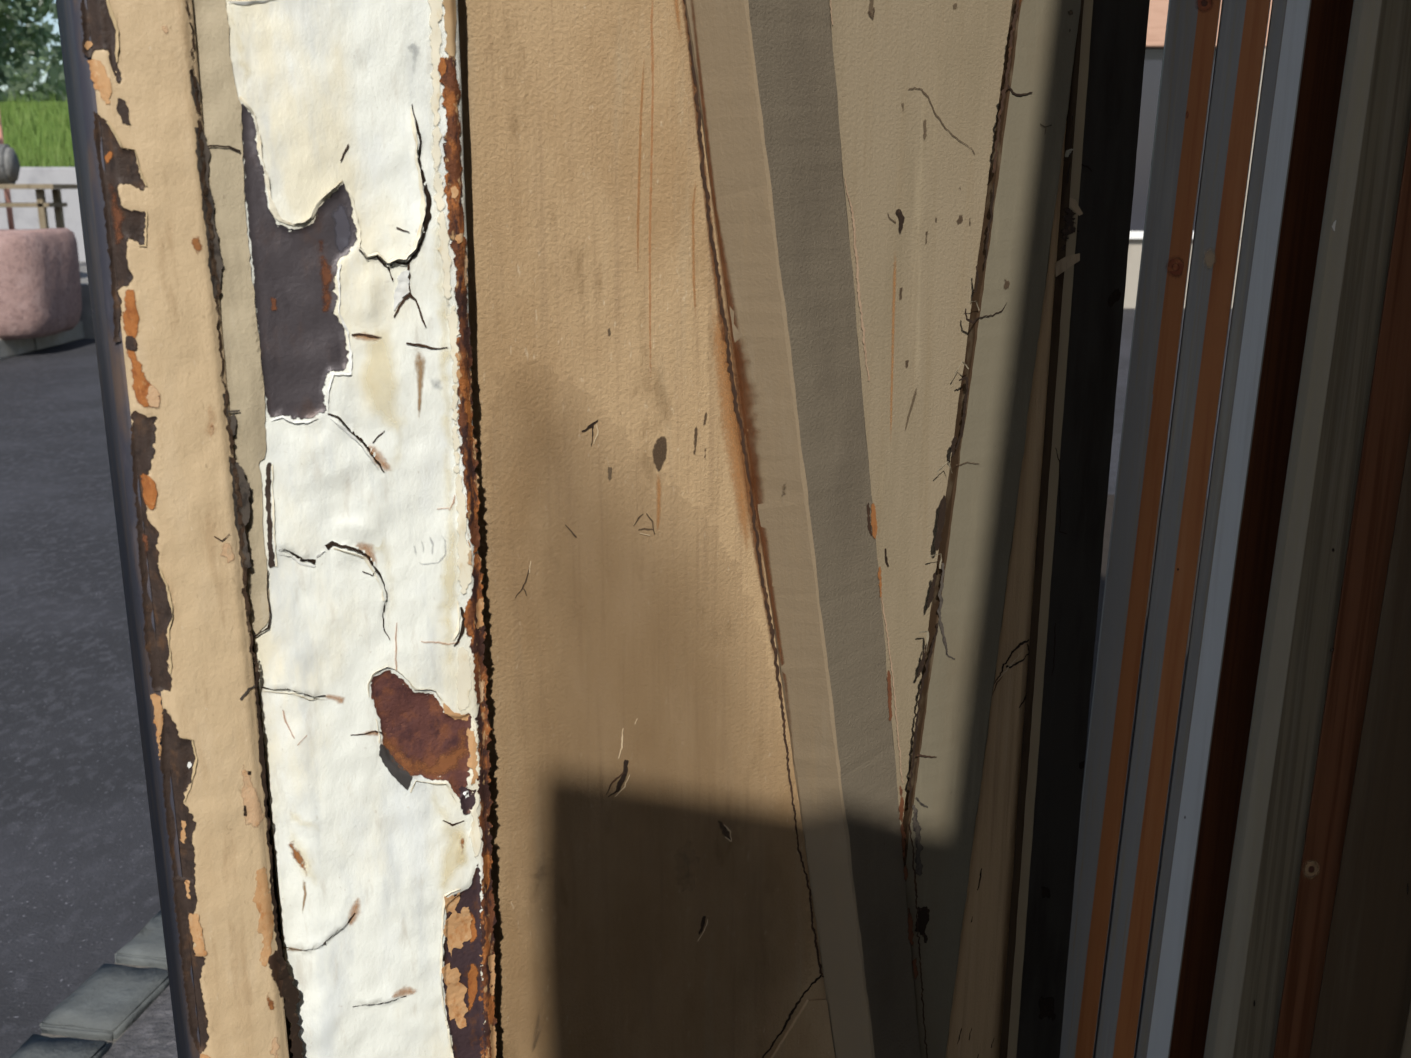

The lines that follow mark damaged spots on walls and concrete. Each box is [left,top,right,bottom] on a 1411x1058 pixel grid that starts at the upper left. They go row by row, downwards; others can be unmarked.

peeling [80,0,147,343]
peeling [130,411,210,1058]
crack [185,0,390,1058]
spalling [239,96,361,423]
crack [351,104,432,339]
corrosion [367,0,497,1058]
peeling [440,305,487,1058]
crack [675,0,824,1058]
crack [951,361,979,466]
crack [908,0,1033,324]
crack [992,623,1056,708]
crack [1108,288,1121,307]